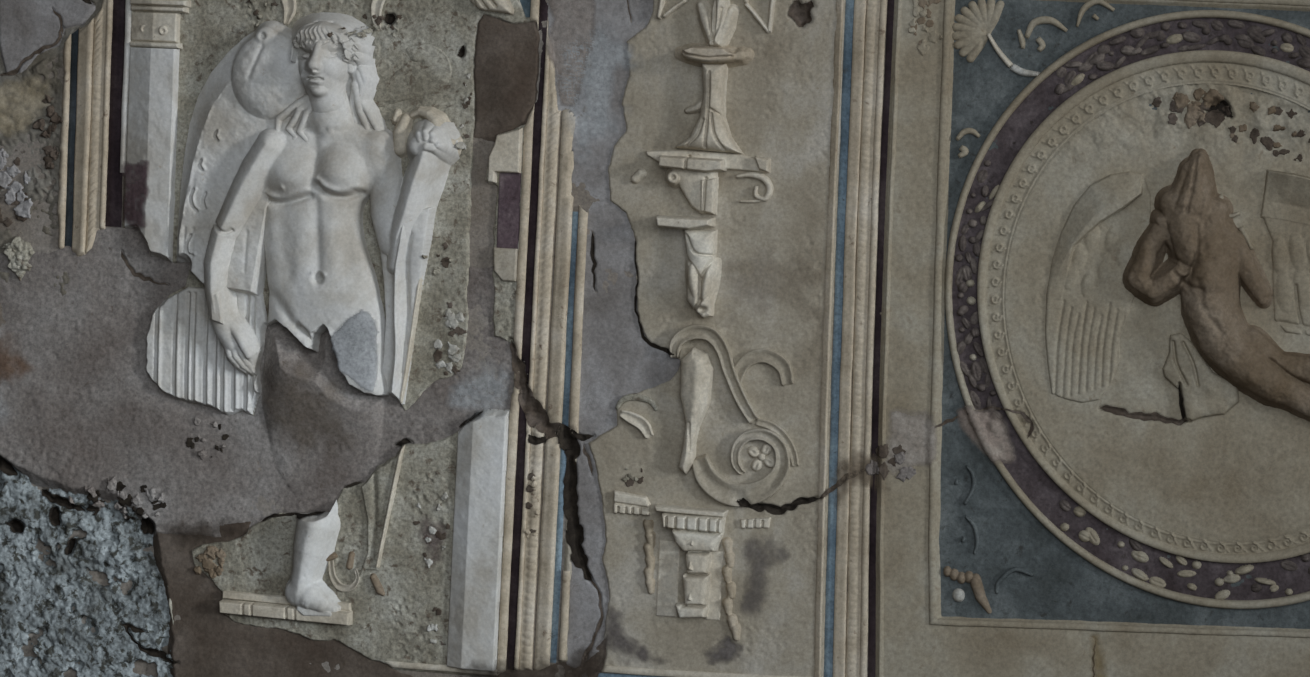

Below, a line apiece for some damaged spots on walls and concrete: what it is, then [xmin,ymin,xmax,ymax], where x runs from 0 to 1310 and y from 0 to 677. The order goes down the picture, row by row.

spalling [788,0,814,27]
spalling [1152,88,1310,162]
spalling [0,53,64,289]
crack [459,411,483,427]
crack [396,438,412,446]
spalling [49,476,167,534]
crack [261,482,362,522]
crack [510,340,604,662]
crack [737,468,864,515]
spalling [6,519,24,533]
spalling [65,538,76,555]